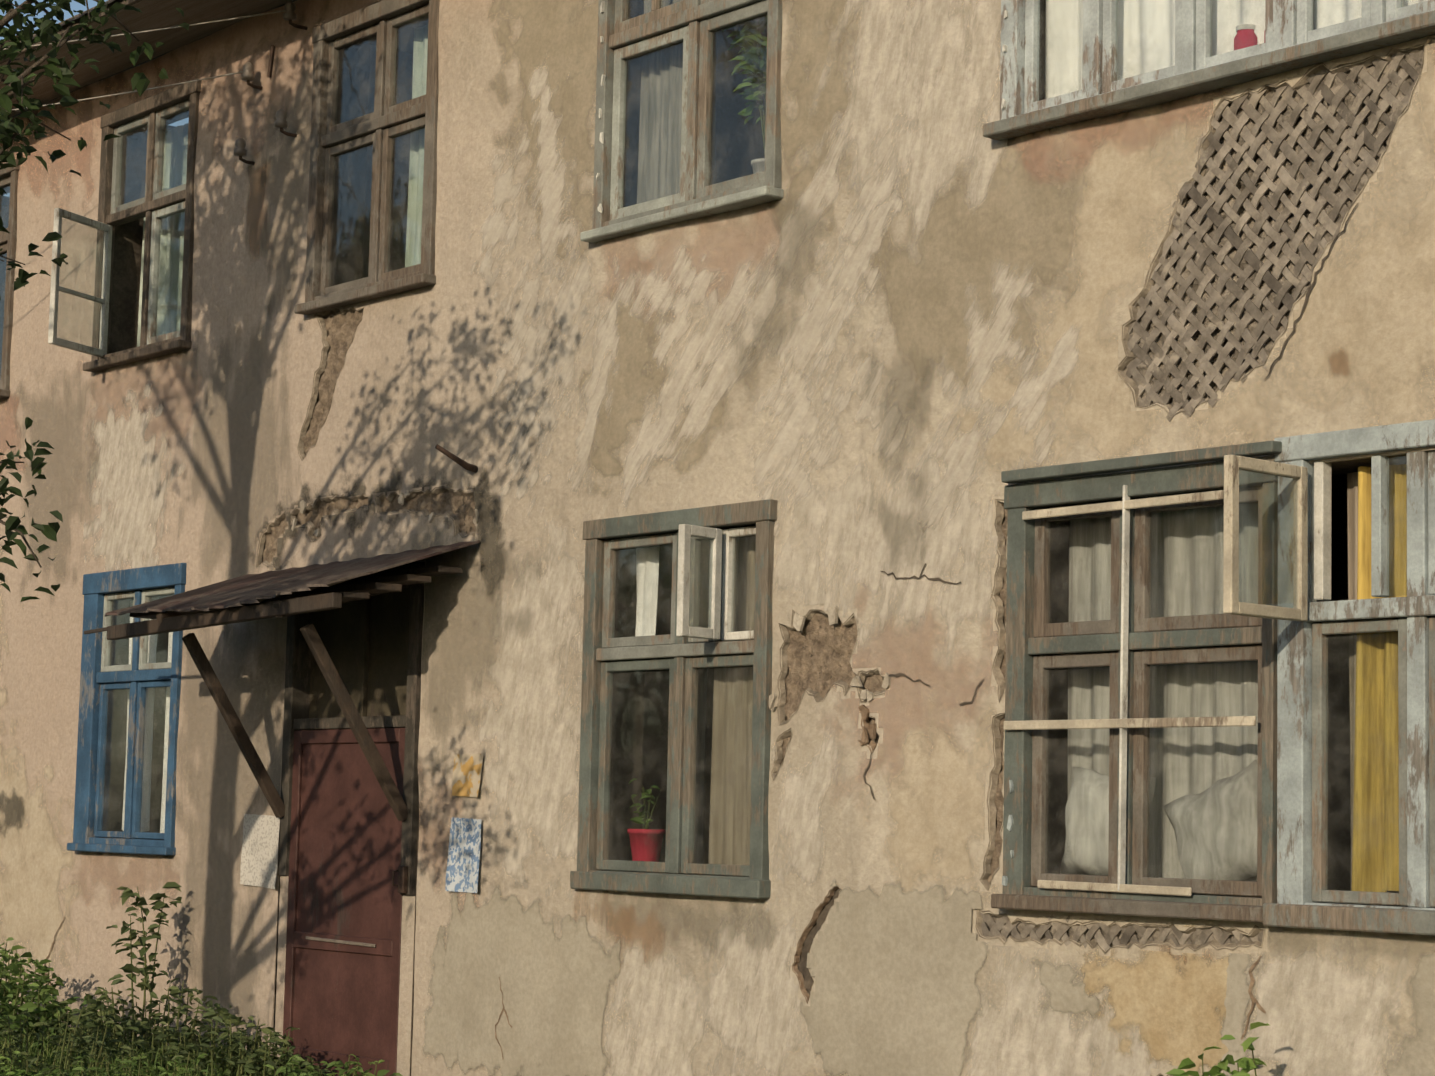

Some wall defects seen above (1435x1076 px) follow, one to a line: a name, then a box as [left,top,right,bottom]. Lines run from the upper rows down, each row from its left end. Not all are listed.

spalling [1115,44,1424,422]
spalling [297,307,364,460]
damp [249,68,1080,595]
spalling [256,486,479,568]
crack [881,563,961,584]
spalling [769,606,891,780]
spalling [980,499,1014,891]
spalling [975,909,1265,954]